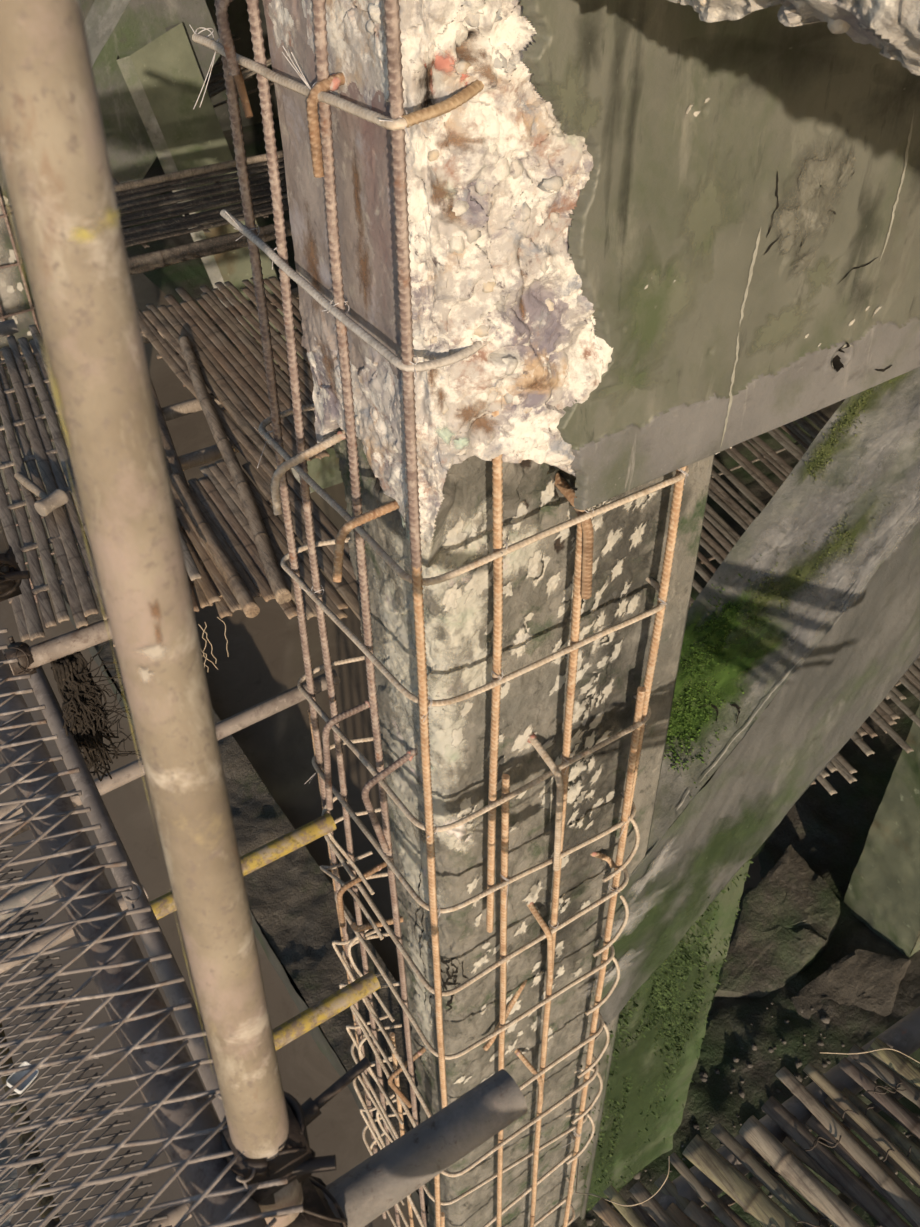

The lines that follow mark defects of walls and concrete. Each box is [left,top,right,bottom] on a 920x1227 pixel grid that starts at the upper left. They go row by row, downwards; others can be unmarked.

spalling [668,0,920,75]
spalling [266,0,614,611]
damp [730,403,920,638]
spalling [787,484,920,660]
spalling [451,702,473,747]
spalling [487,492,656,830]
spalling [446,797,477,851]
spalling [467,877,482,927]
spalling [523,881,542,905]
spalling [558,894,590,914]
spalling [454,941,583,1084]
damp [584,811,765,1210]